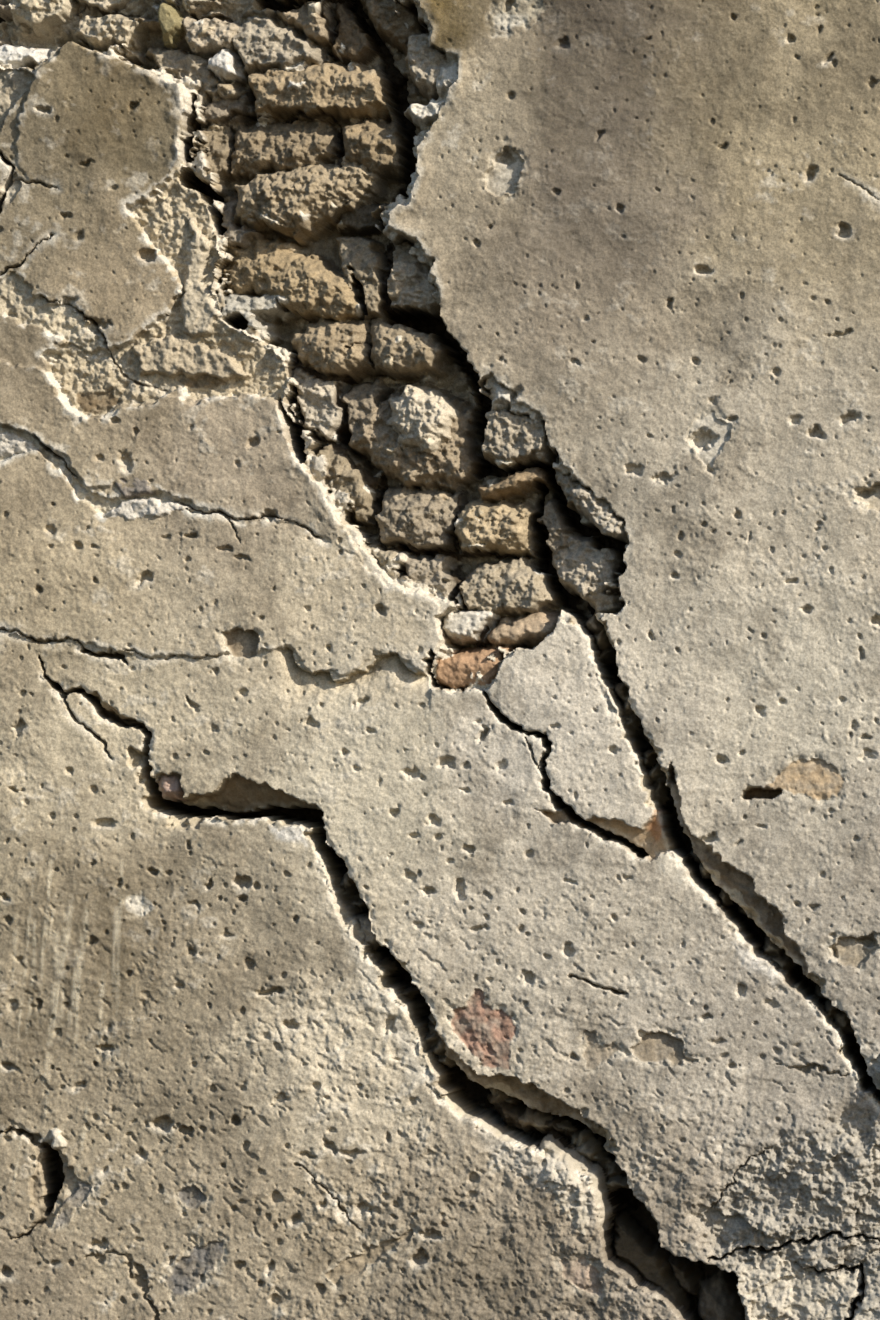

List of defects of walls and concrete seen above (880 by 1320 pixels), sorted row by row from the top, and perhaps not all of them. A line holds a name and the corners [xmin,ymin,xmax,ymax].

crack [0,151,59,214]
crack [839,174,880,201]
crack [39,295,170,393]
spalling [0,0,630,696]
crack [35,436,79,480]
crack [278,401,307,464]
crack [164,500,327,543]
spalling [742,758,846,802]
crack [482,589,880,1103]
crack [0,628,746,1320]
spalling [451,988,517,1071]
crack [710,1146,775,1212]